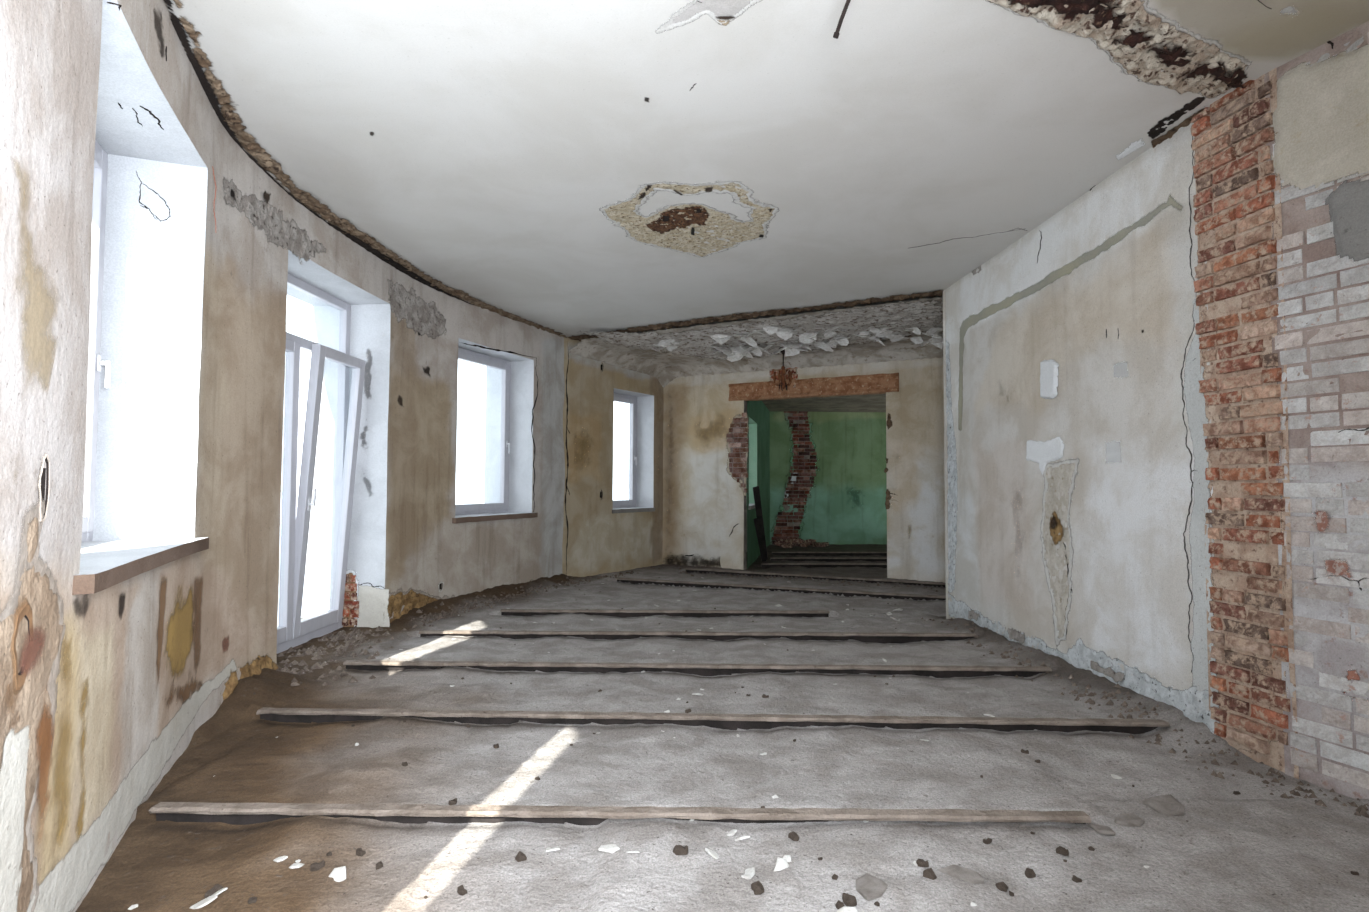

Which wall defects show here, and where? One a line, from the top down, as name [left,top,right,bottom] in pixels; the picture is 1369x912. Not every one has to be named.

peeling [656,0,761,33]
peeling [18,169,27,208]
peeling [22,226,55,388]
peeling [223,178,326,264]
peeling [387,279,446,339]
crack [911,228,1042,263]
flaking render [577,74,1291,754]
crack [1180,136,1197,672]
damp [157,579,203,704]
peeling [0,505,66,912]